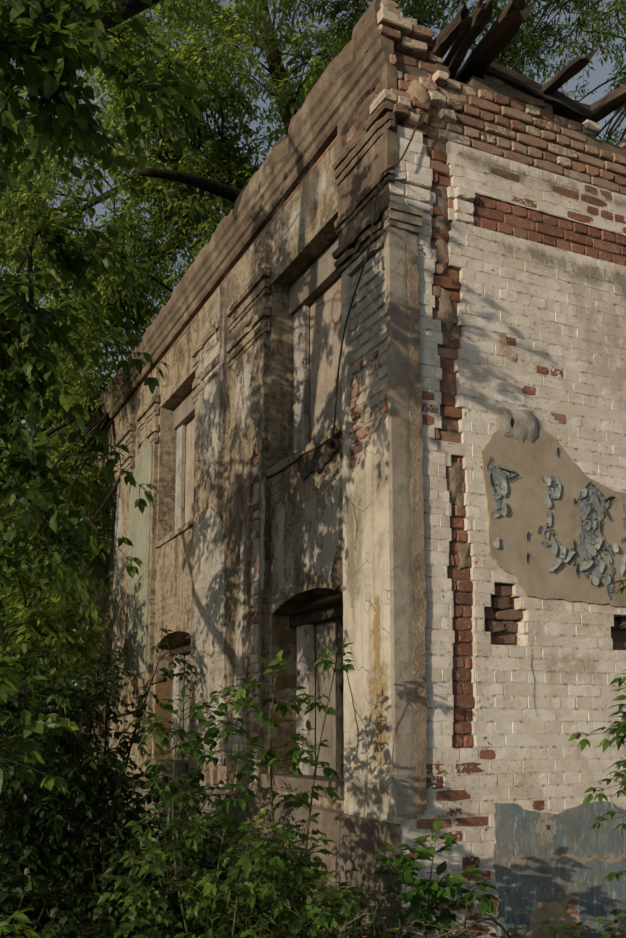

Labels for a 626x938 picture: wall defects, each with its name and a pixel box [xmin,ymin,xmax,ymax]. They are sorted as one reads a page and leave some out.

flaking render [473,185,626,266]
flaking render [297,248,388,480]
peeling [487,457,520,518]
spalling [407,241,495,841]
peeling [526,474,626,600]
spalling [484,585,522,646]
spalling [611,617,626,650]
water stain [370,597,389,763]
flaking render [533,800,545,811]
spalling [523,897,583,938]